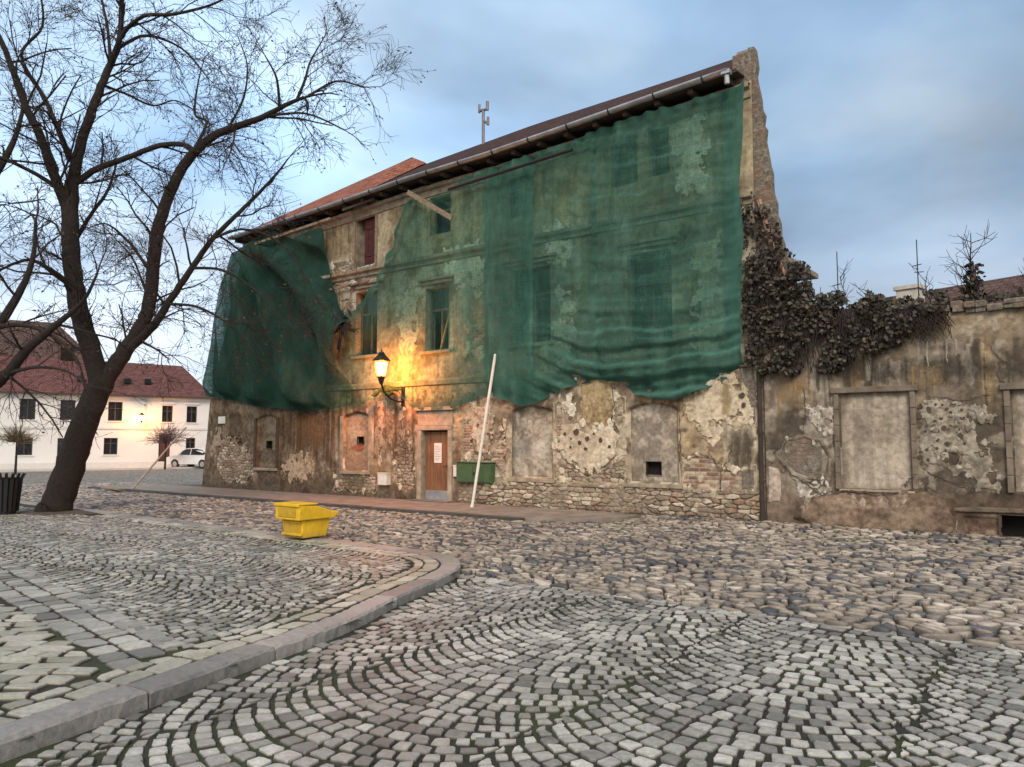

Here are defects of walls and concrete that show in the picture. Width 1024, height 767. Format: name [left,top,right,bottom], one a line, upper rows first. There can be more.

spalling [208,427,260,485]
peeling [280,450,315,484]
spalling [459,402,509,482]
peeling [552,377,629,487]
peeling [679,356,835,503]
peeling [917,395,1002,494]